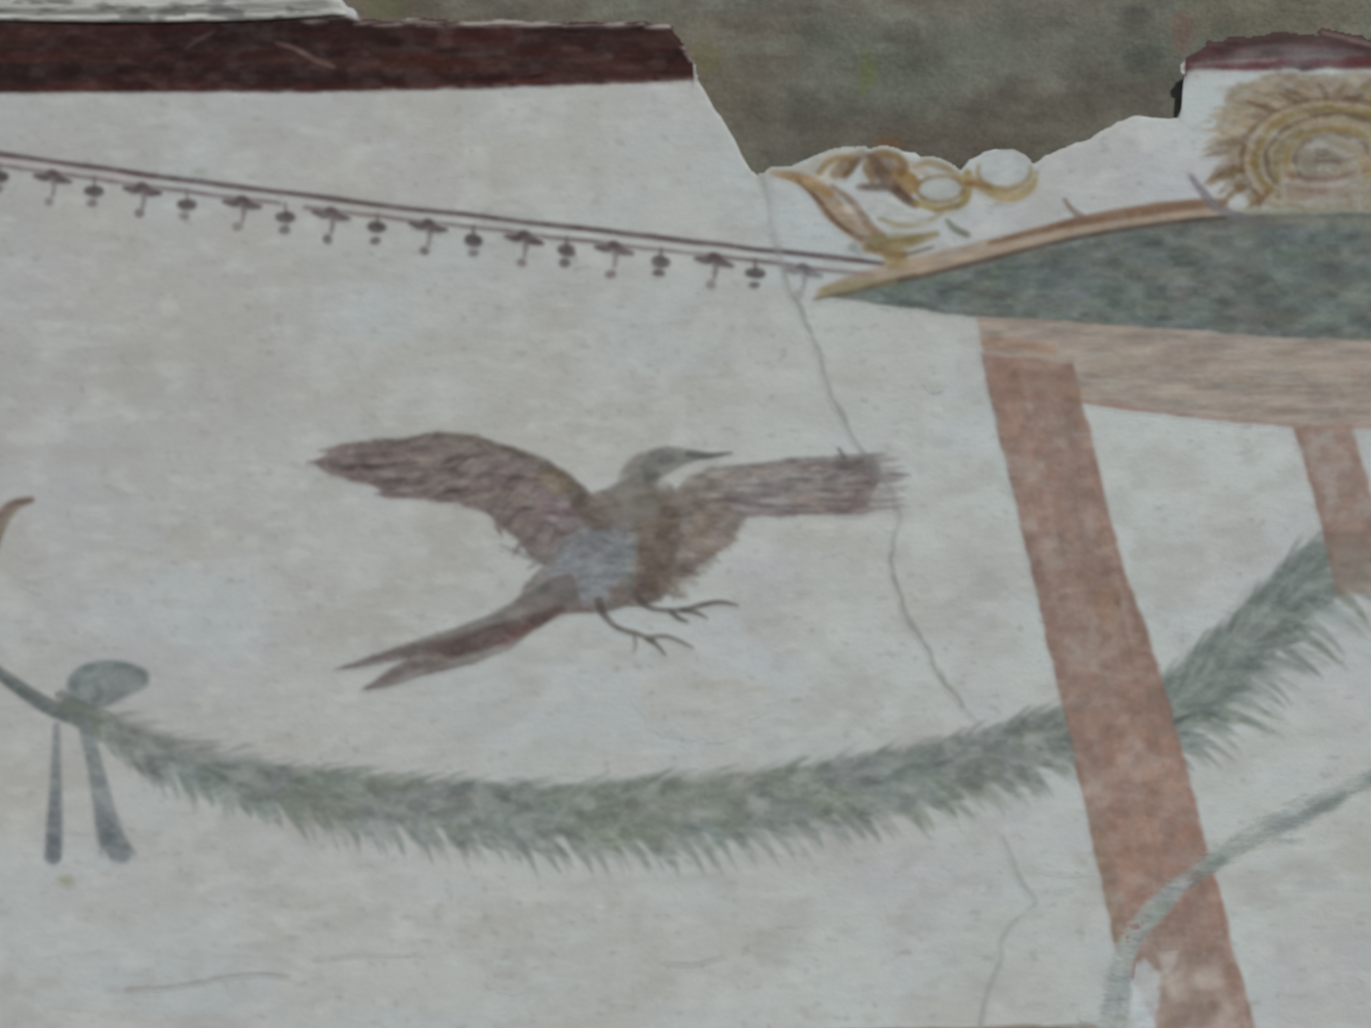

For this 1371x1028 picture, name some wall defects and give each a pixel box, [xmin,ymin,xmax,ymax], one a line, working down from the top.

spalling [299,18,330,27]
spalling [345,0,1209,98]
crack [756,170,985,730]
crack [973,834,1097,1028]
crack [1072,766,1371,1028]